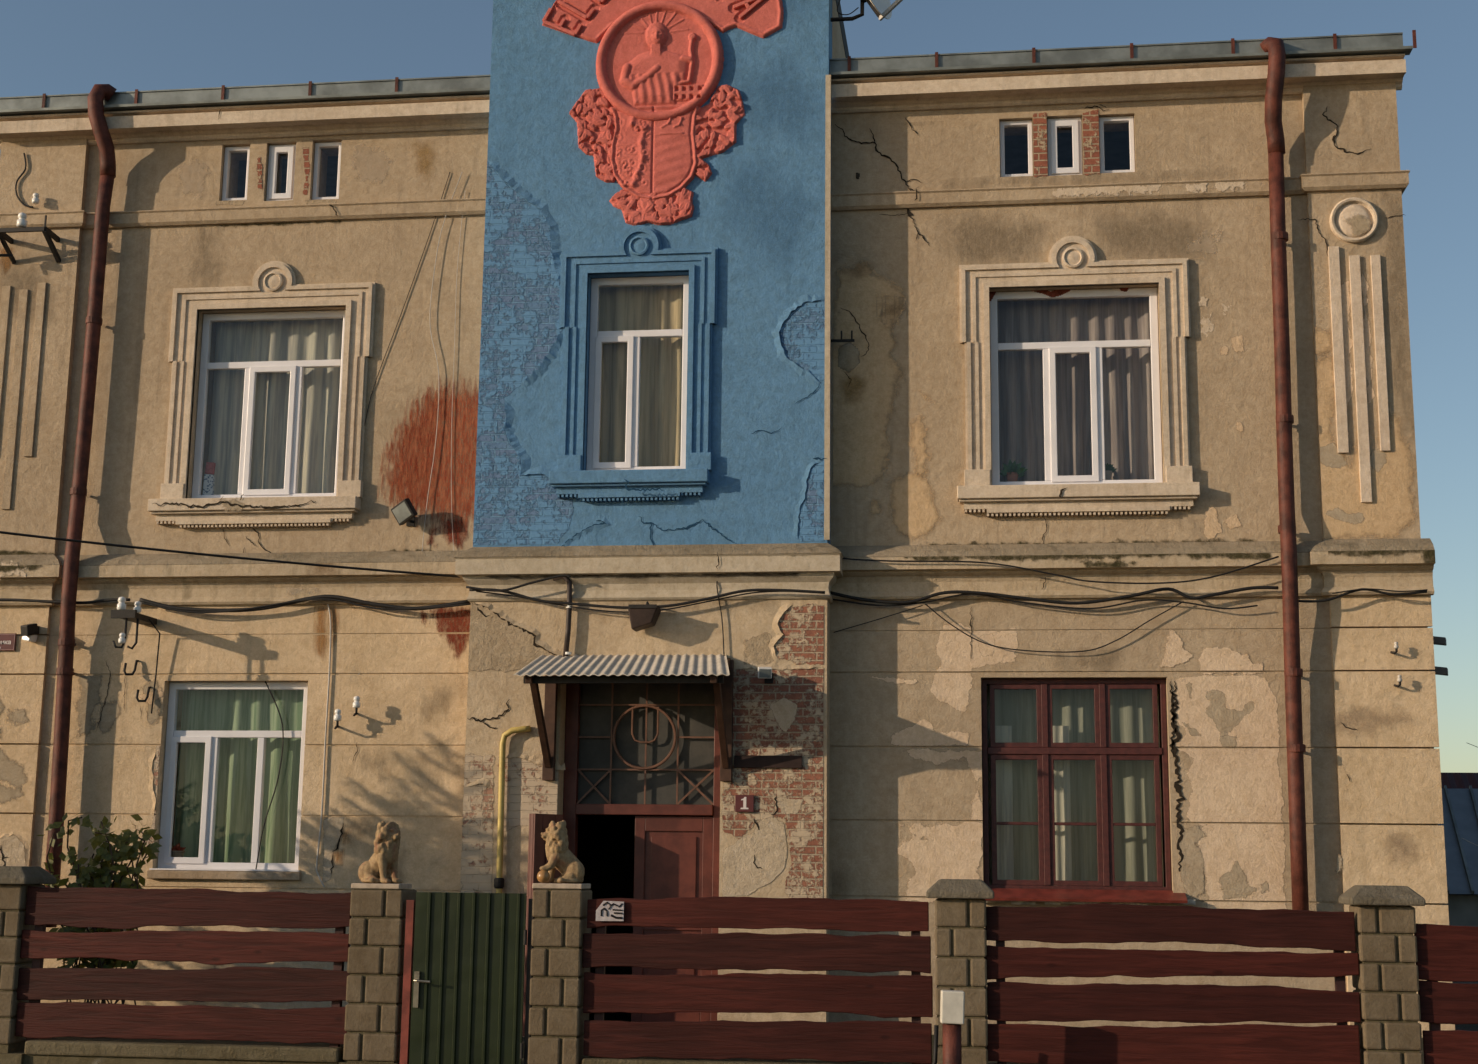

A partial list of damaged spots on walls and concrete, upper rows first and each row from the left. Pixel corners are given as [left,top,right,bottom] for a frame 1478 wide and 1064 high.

crack [835,124,929,245]
crack [1317,105,1373,159]
corrosion [380,383,478,546]
flaking render [473,159,574,545]
crack [561,479,737,568]
peeling [771,262,938,541]
corrosion [421,608,470,657]
flaking render [721,600,824,898]
peeling [891,719,983,903]
peeling [871,622,1018,712]
crack [1169,681,1185,872]
peeling [1159,630,1287,910]